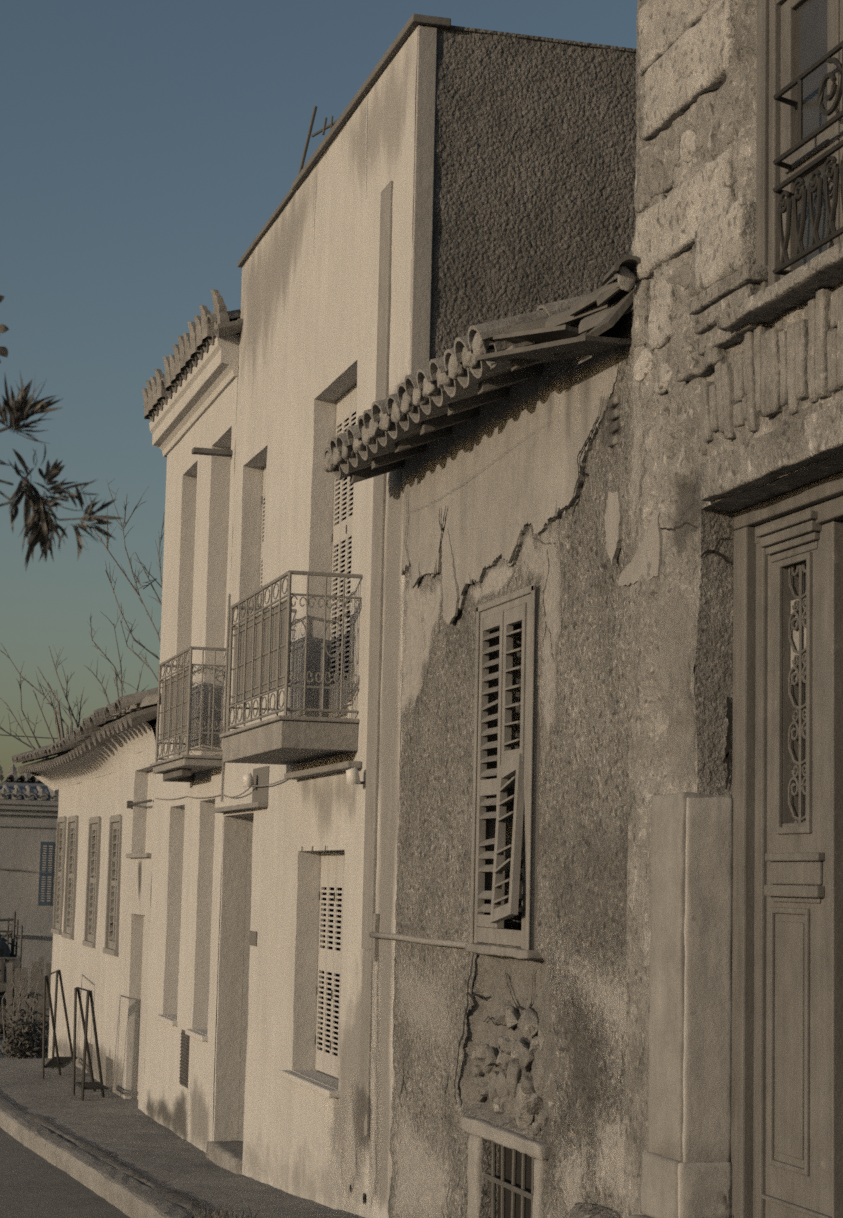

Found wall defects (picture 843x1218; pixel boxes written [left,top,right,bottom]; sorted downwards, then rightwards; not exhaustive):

peeling [604,491,663,587]
peeling [400,499,561,767]
crack [722,697,732,789]
flaking render [454,953,556,1136]
damp [146,1097,186,1140]